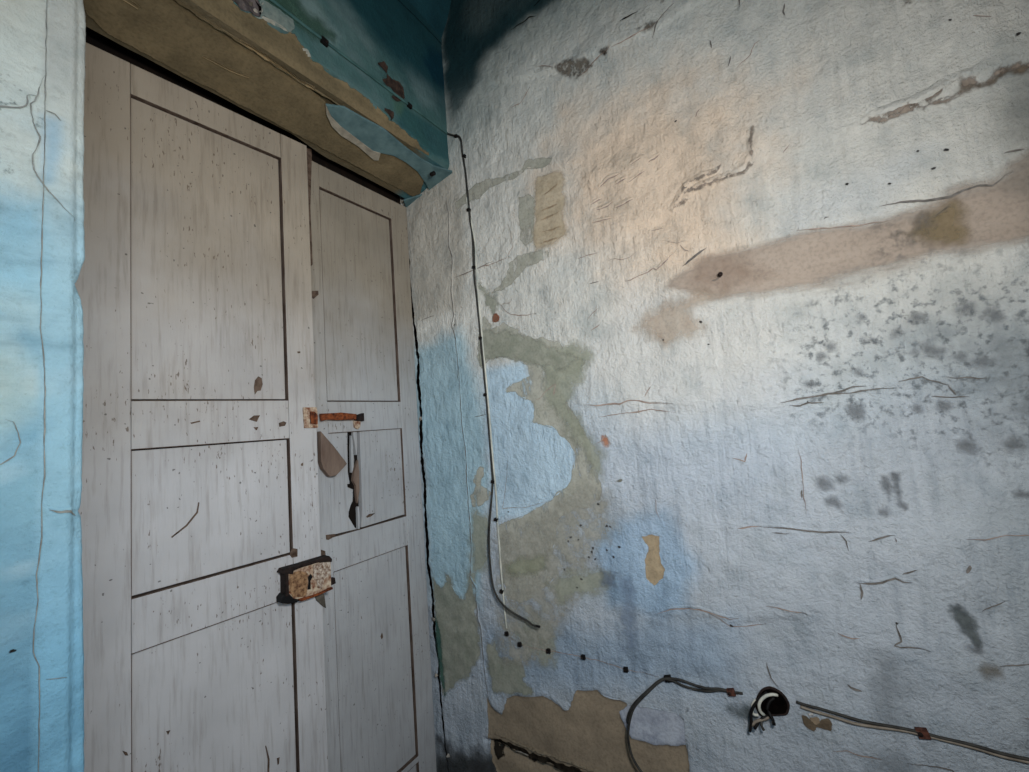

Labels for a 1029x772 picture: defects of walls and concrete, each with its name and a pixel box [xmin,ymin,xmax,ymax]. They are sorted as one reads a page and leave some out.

flaking render [83,0,453,208]
flaking render [541,10,667,77]
flaking render [960,65,1029,92]
damp [645,149,1029,343]
peeling [455,157,607,603]
crack [409,197,513,772]
peeling [642,534,665,585]
peeling [433,575,480,696]
flaking render [487,689,689,772]